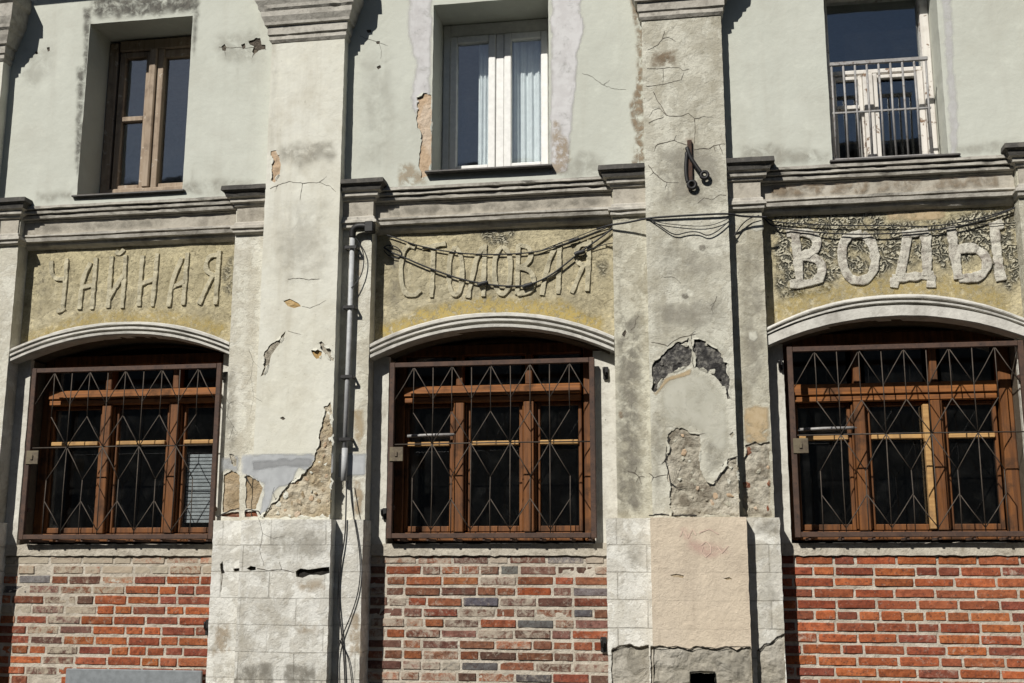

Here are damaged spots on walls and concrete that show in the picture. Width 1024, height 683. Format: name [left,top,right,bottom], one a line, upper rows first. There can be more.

flaking render [241,38,266,54]
peeling [270,150,281,182]
crack [270,176,336,197]
flaking render [416,93,433,178]
crack [582,32,723,187]
flaking render [261,332,285,376]
flaking render [311,341,334,361]
flaking render [650,337,731,399]
flaking render [222,402,335,519]
flaking render [666,428,772,517]
crack [217,468,309,572]